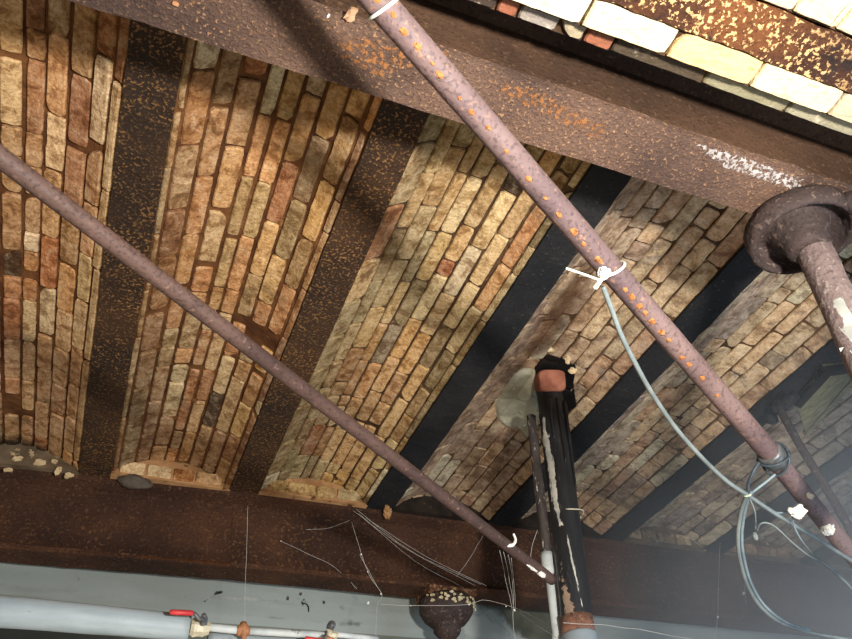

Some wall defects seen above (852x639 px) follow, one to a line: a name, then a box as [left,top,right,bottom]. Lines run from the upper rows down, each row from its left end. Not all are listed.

rust [343,7,358,22]
rust [339,38,413,77]
rust [602,0,852,94]
rust [501,82,605,140]
leakage [697,144,804,189]
spalling [534,347,577,412]